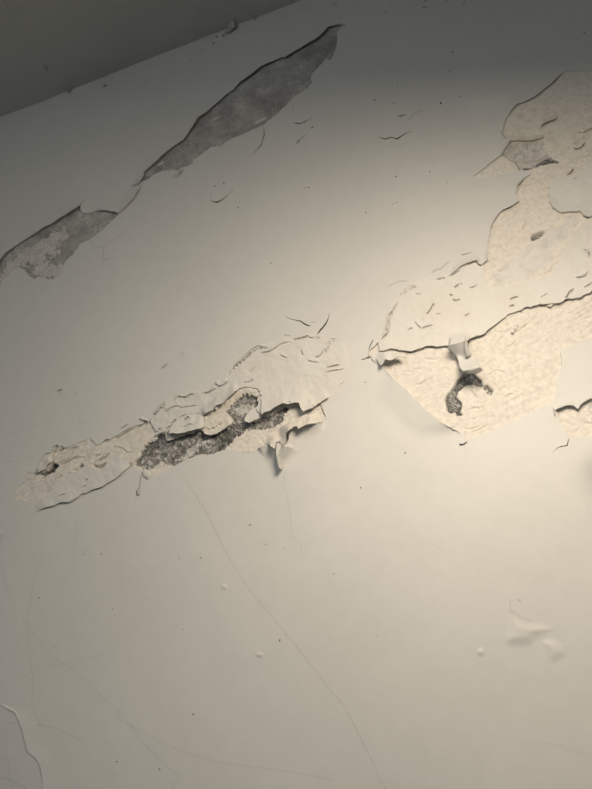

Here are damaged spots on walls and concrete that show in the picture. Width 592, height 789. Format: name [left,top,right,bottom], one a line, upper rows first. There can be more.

peeling [0,19,345,283]
flaking render [365,71,592,444]
flaking render [15,333,351,514]